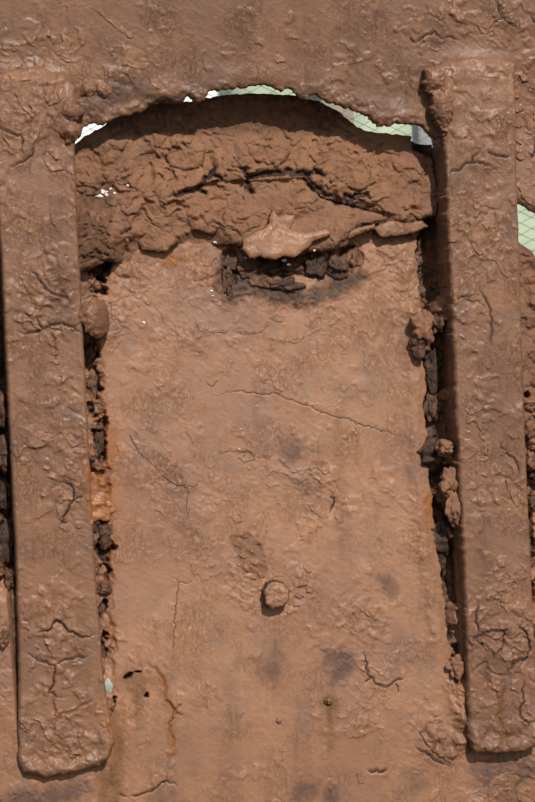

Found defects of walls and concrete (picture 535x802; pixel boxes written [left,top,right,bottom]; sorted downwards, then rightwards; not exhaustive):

crack [208,381,405,438]
corrosion [519,243,535,485]
corrosion [84,345,116,616]
corrosion [527,494,535,539]
crack [29,620,92,723]
corrosion [101,622,113,674]
crack [467,605,533,743]